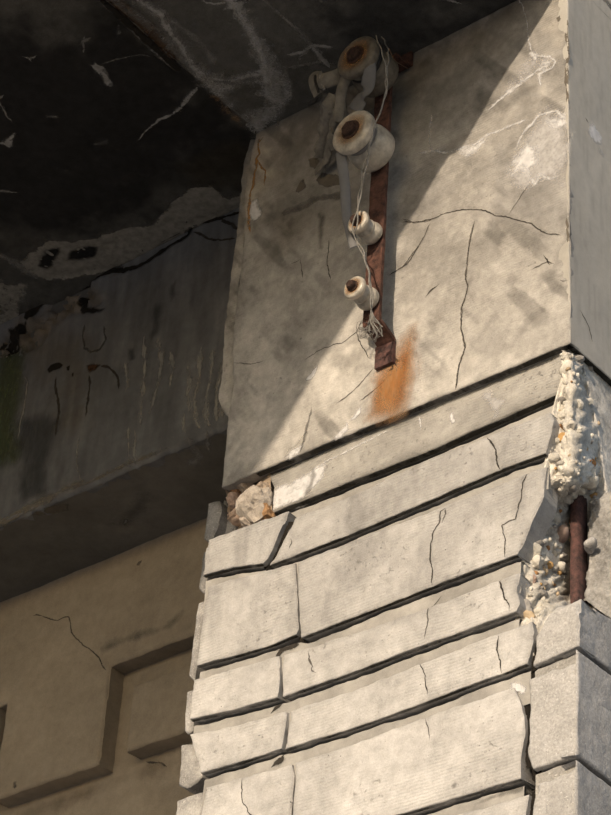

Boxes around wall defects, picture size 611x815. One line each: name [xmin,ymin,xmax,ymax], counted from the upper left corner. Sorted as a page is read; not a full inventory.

crack [0,95,15,148]
crack [140,87,198,138]
peeling [20,187,242,314]
peeling [0,282,43,355]
crack [390,187,559,388]
crack [306,321,391,402]
corrosion [379,355,408,411]
spalling [225,473,276,529]
spalling [515,350,611,634]
crack [424,509,446,638]
crack [33,614,106,670]